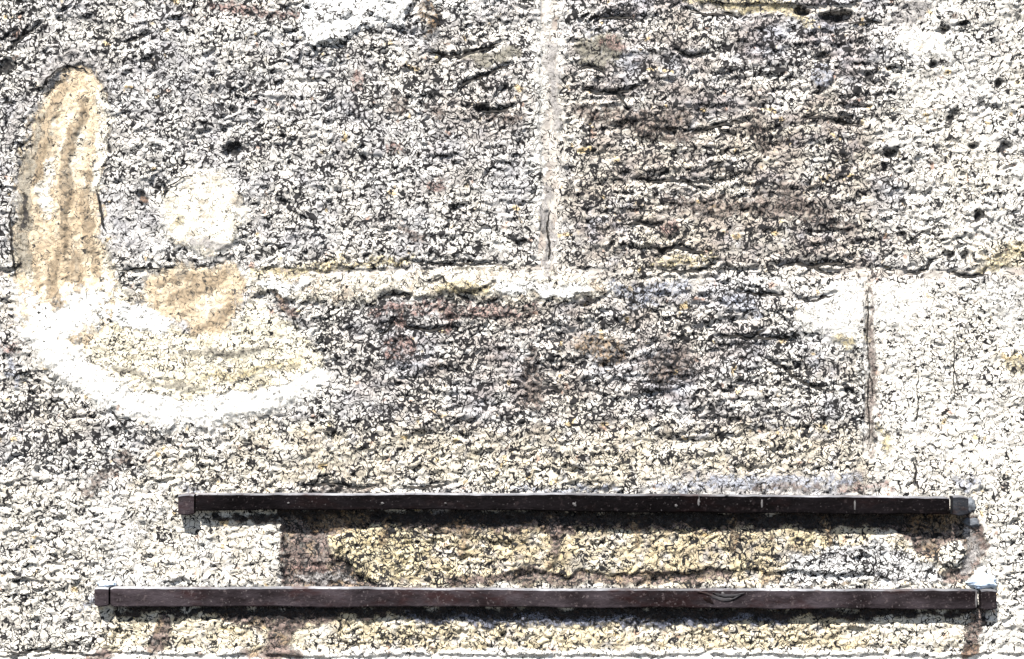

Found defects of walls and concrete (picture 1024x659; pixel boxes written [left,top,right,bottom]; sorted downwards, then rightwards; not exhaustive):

crack [544,214,552,259]
crack [865,288,873,442]